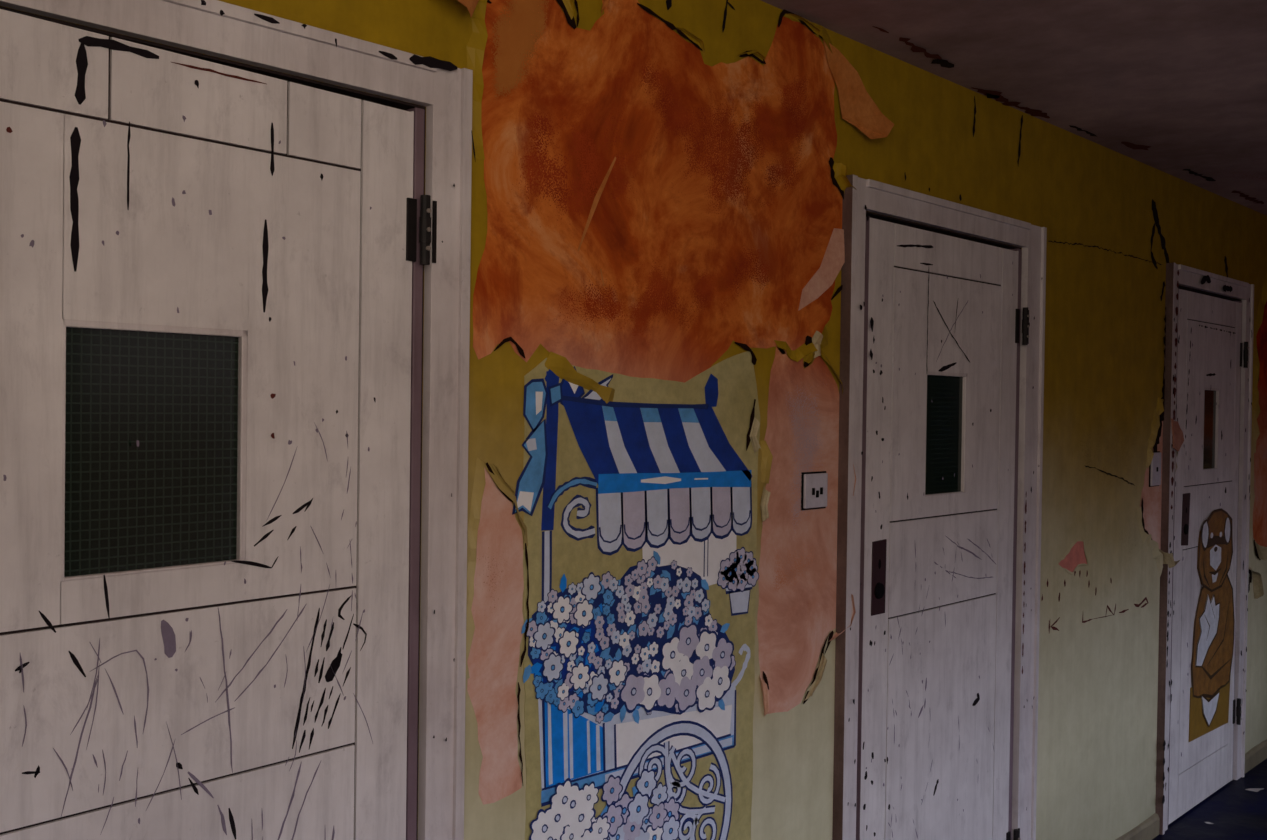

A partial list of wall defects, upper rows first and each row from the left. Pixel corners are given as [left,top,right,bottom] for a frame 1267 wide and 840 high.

peeling [254,13,280,24]
peeling [379,0,894,716]
peeling [1137,270,1184,583]
peeling [1201,275,1232,292]
peeling [1243,272,1267,611]
peeling [453,458,529,805]